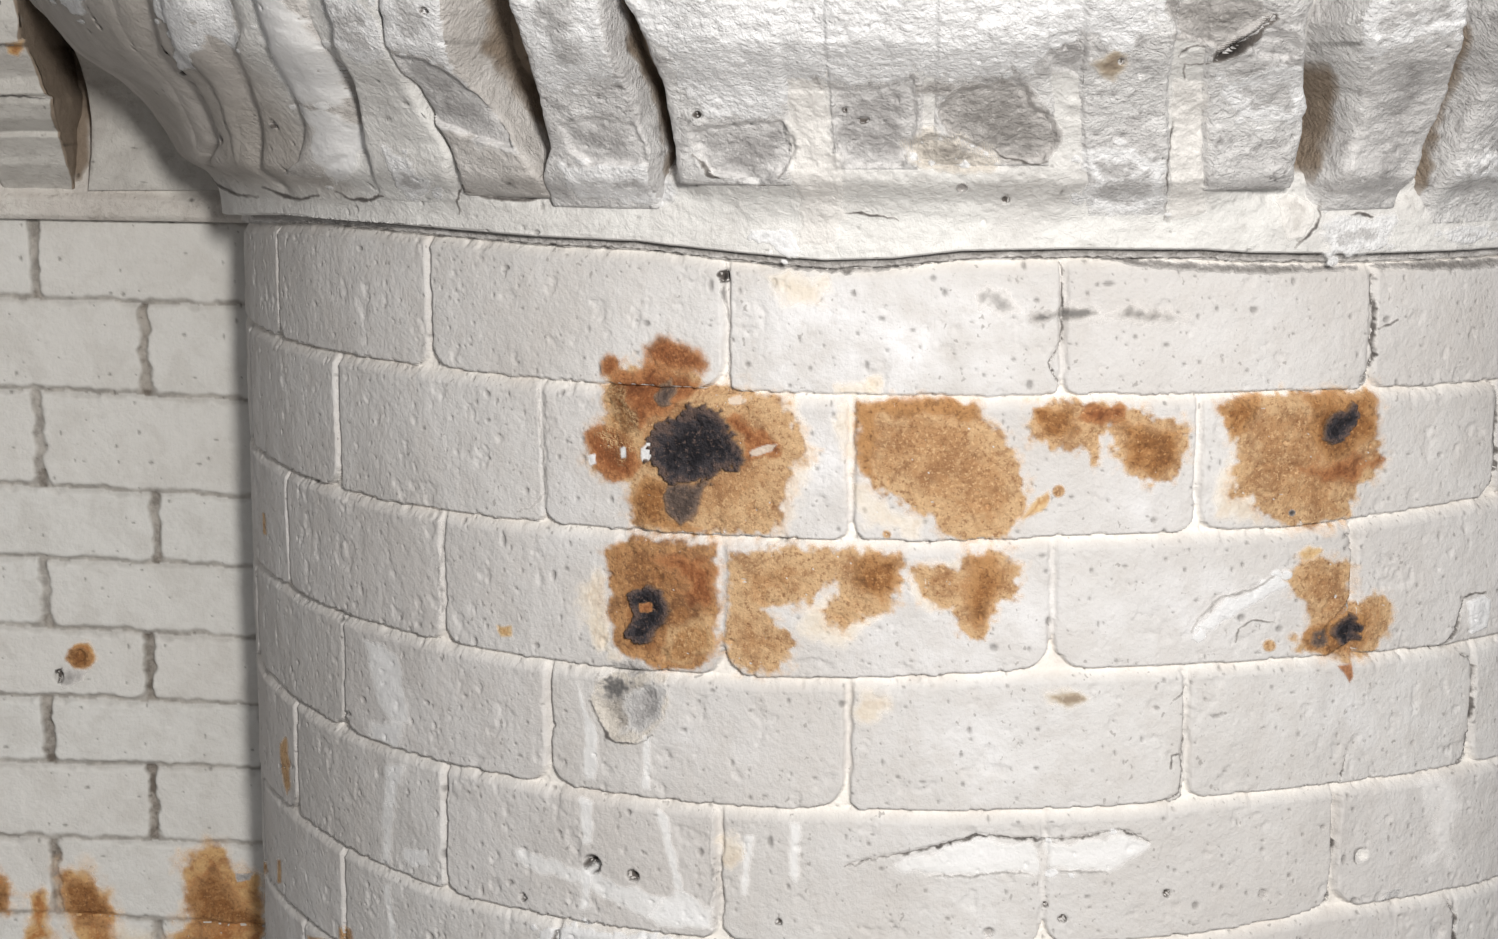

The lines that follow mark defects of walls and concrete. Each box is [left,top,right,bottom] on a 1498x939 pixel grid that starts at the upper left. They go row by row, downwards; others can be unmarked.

peeling [50,0,86,23]
peeling [153,0,518,201]
rust [584,336,1192,677]
rust [1217,386,1394,682]
rust [62,643,95,688]
rust [0,874,10,915]
rust [24,869,118,939]
rust [168,839,281,939]
peeling [531,918,673,939]
peeling [844,829,1150,879]